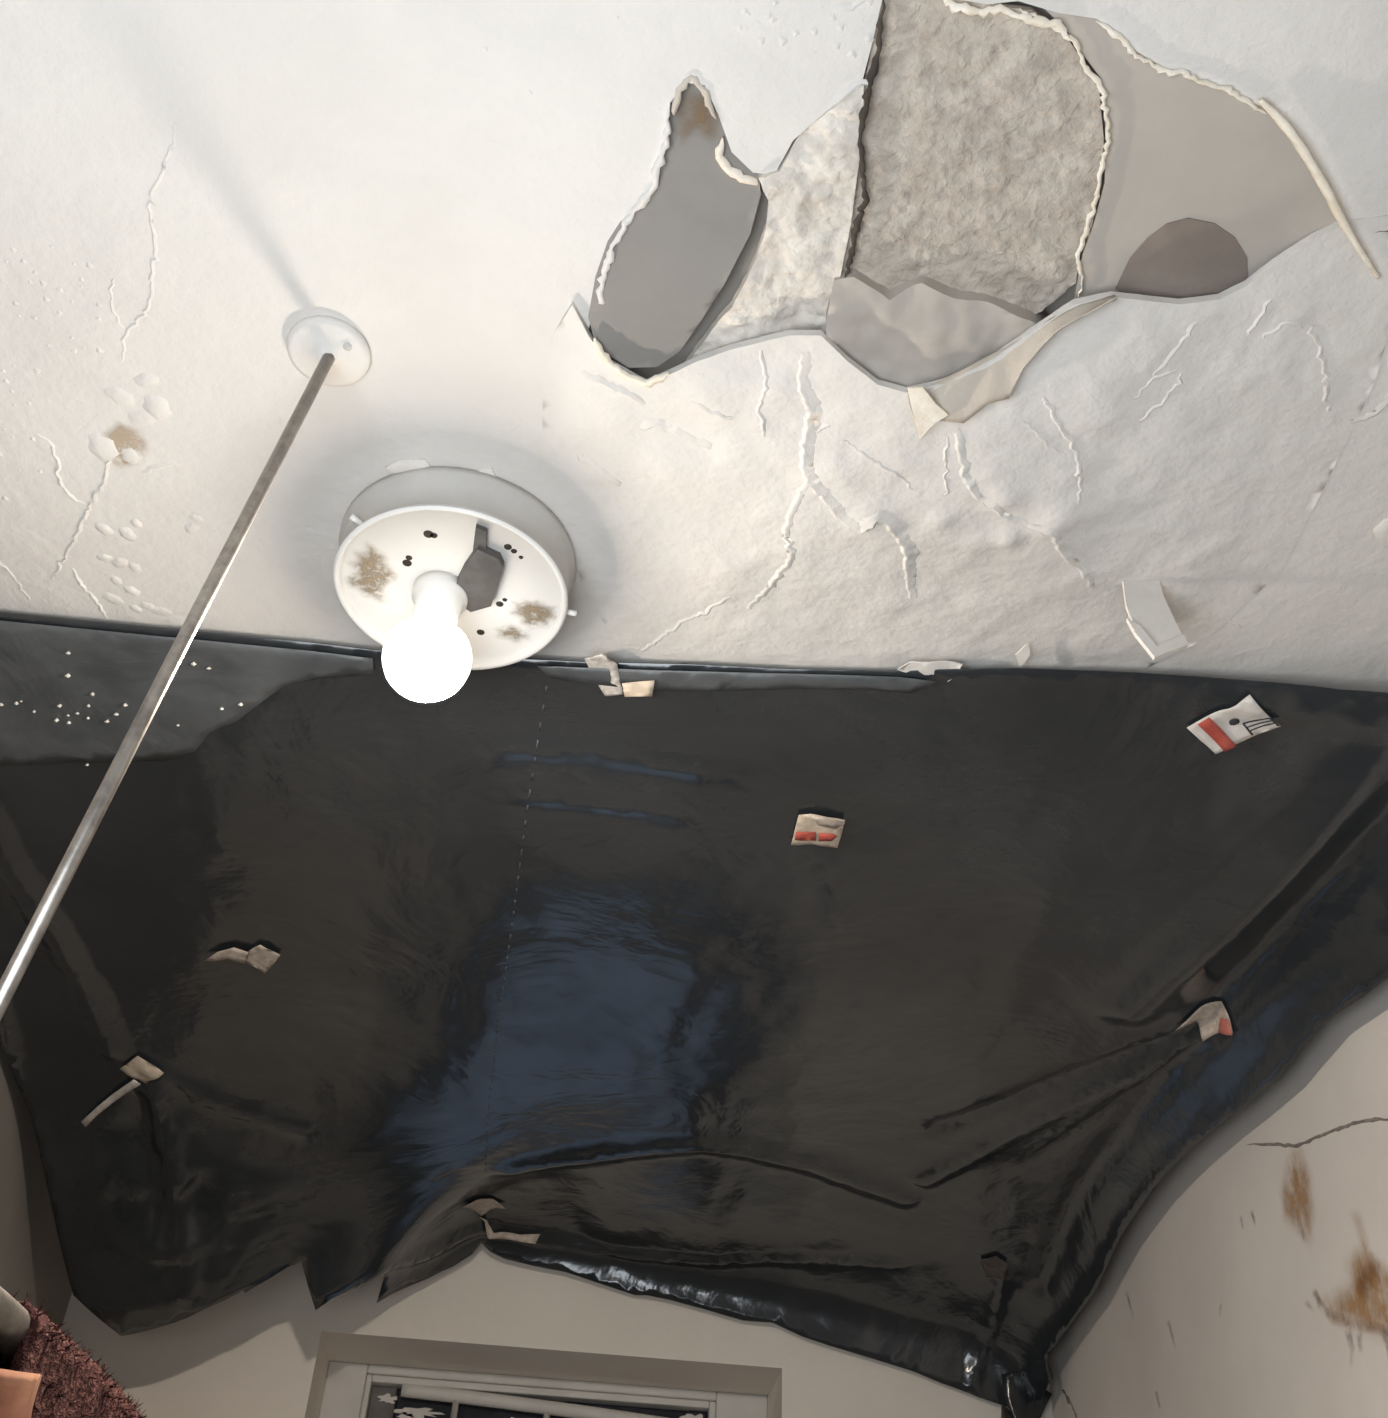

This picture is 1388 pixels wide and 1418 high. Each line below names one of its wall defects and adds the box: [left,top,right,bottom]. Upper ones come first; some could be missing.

crack [108,122,178,362]
flaking render [588,0,1380,439]
crack [0,434,182,620]
crack [575,350,1095,651]
corrosion [1286,1168,1307,1220]
crack [1247,1117,1388,1148]
corrosion [1340,1259,1388,1325]